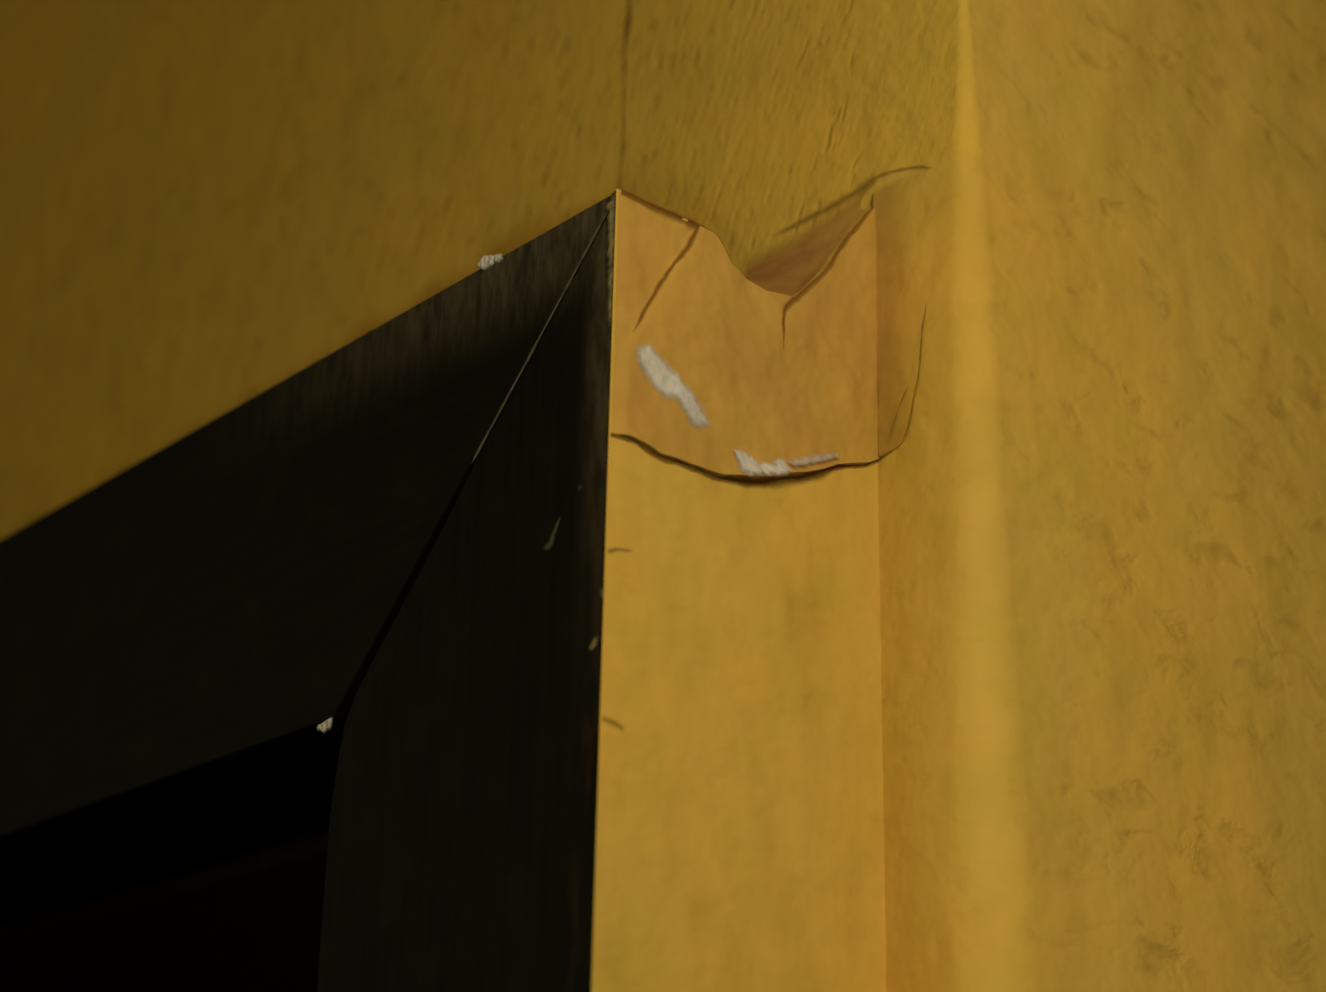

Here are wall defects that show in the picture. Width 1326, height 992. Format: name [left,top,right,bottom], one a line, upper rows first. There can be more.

crack [472,0,728,462]
flaking render [639,345,709,426]
flaking render [735,450,840,475]